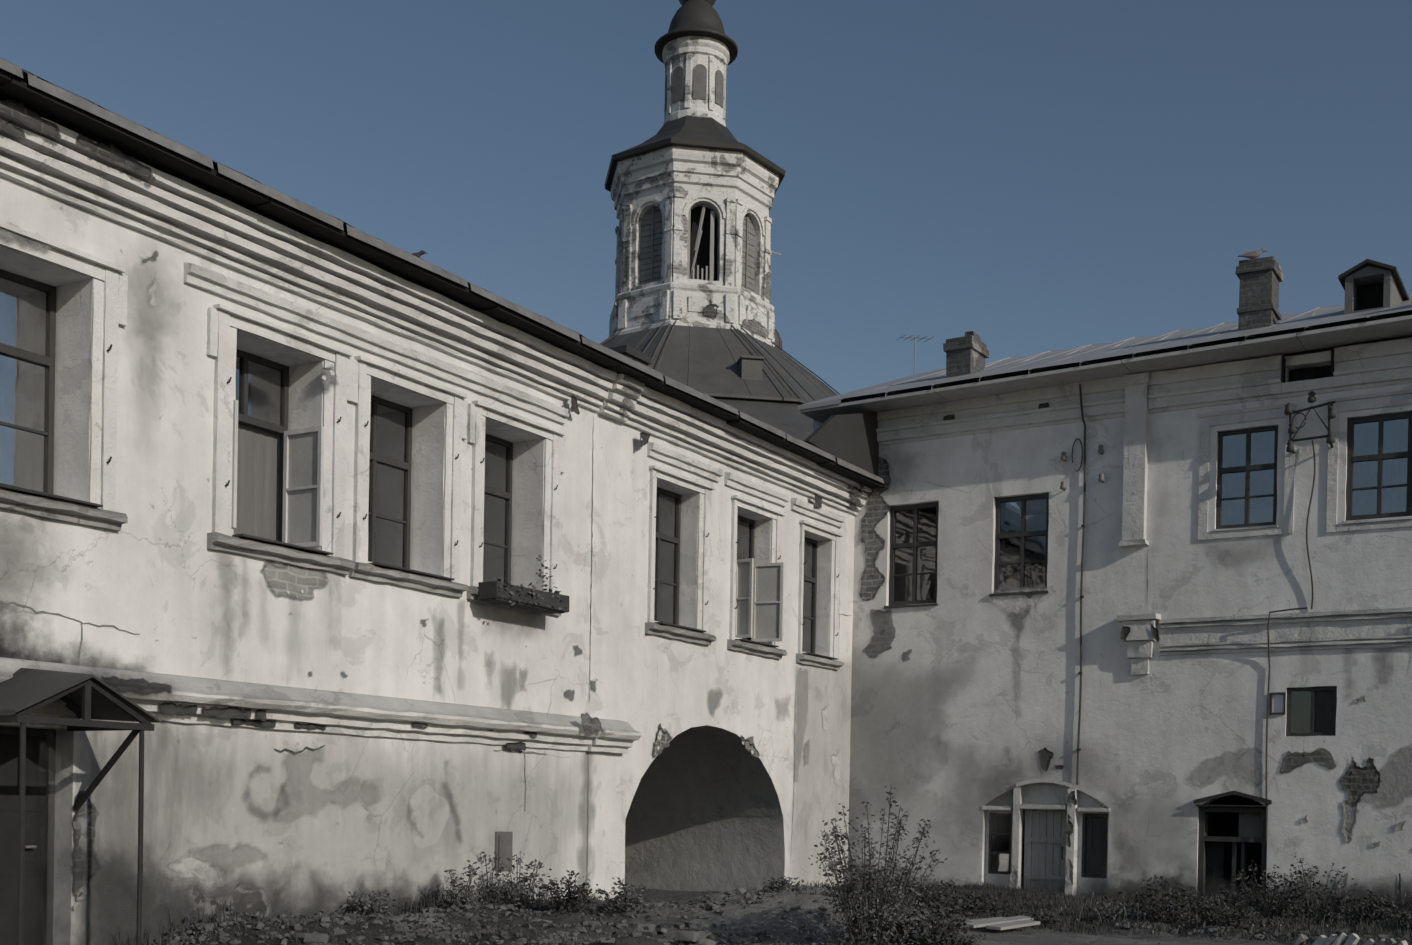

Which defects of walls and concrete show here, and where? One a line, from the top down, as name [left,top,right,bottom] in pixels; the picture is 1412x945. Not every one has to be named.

flaking render [620,231,630,285]
flaking render [703,299,719,319]
flaking render [743,319,768,338]
flaking render [763,265,772,300]
flaking render [261,560,328,600]
flaking render [848,457,912,661]
crack [0,600,136,658]
flaking render [1280,748,1381,843]
spalling [71,791,100,912]